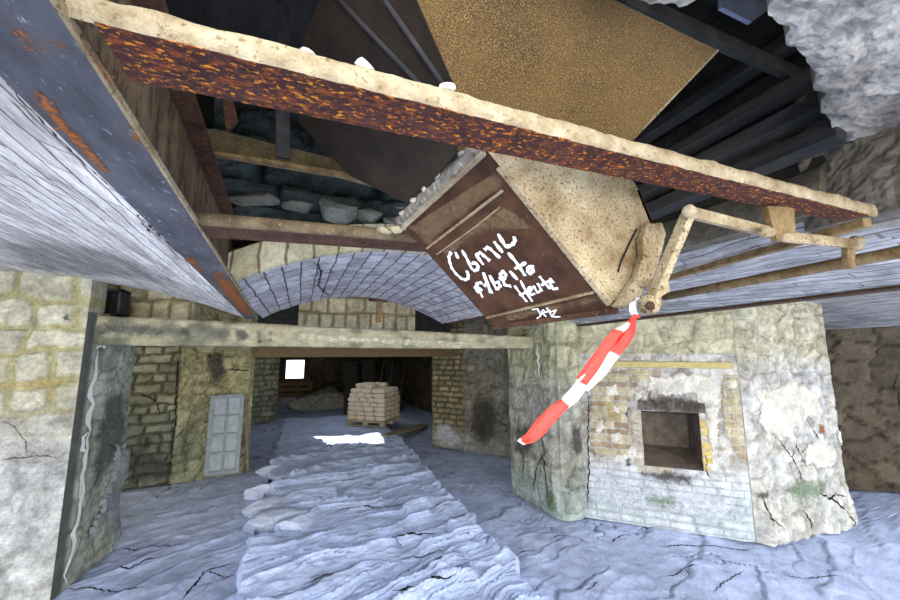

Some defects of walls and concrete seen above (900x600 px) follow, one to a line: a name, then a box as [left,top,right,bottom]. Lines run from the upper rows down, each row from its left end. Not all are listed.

corrosion [33,92,110,173]
corrosion [185,257,253,315]
crack [310,260,330,297]
crack [0,421,57,461]
damp [63,345,126,583]
crack [521,436,548,503]
spalling [589,368,746,463]
crack [775,419,856,526]
crack [663,544,755,592]